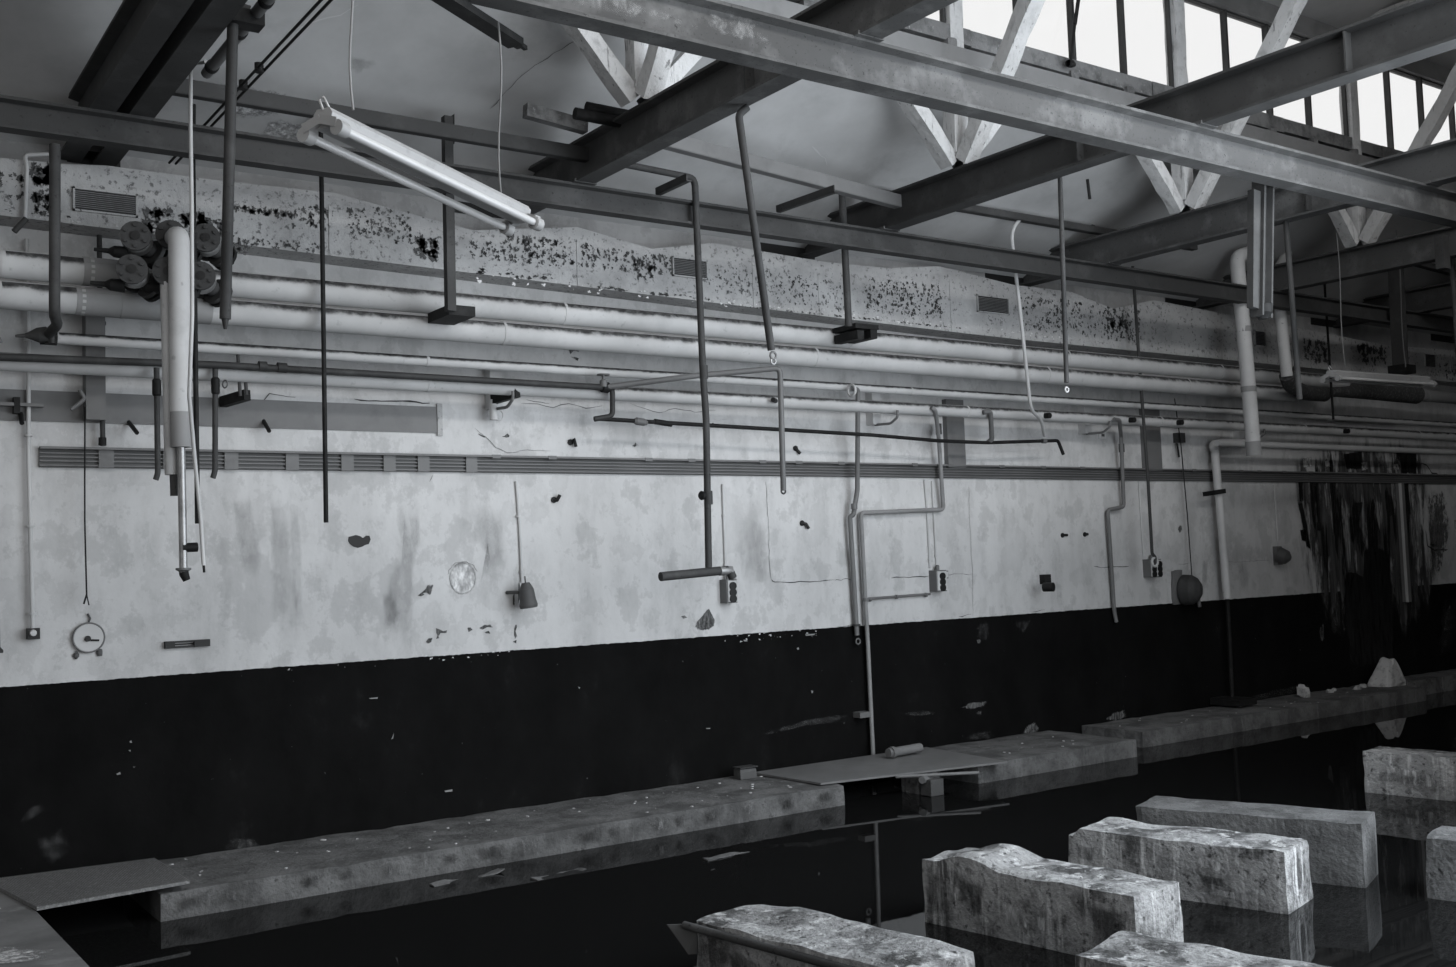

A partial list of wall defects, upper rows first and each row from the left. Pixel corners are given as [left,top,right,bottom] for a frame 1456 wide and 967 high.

peeling [0,161,49,219]